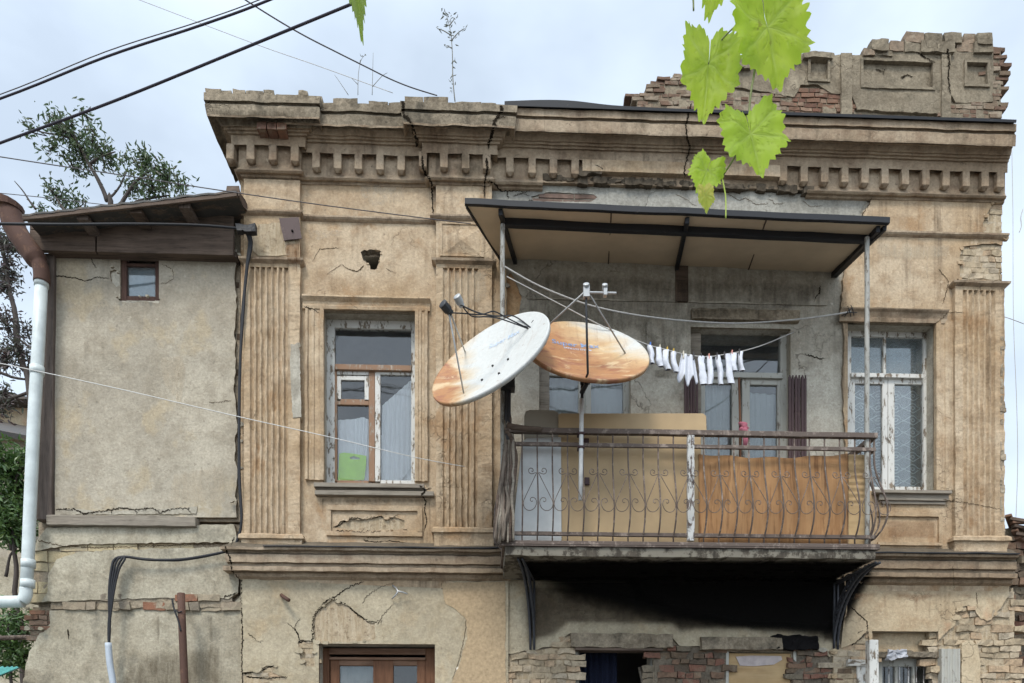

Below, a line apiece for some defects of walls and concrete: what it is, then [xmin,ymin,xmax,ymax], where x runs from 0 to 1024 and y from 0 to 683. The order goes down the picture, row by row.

spalling [721,87,856,114]
spalling [936,47,1012,119]
crack [401,101,434,213]
crack [483,105,533,201]
crack [677,103,695,206]
hole [361,248,382,265]
spalling [957,202,1009,281]
crack [56,507,190,515]
crack [334,485,430,543]
crack [290,582,392,643]
spalling [642,645,738,683]
spalling [916,588,1024,683]